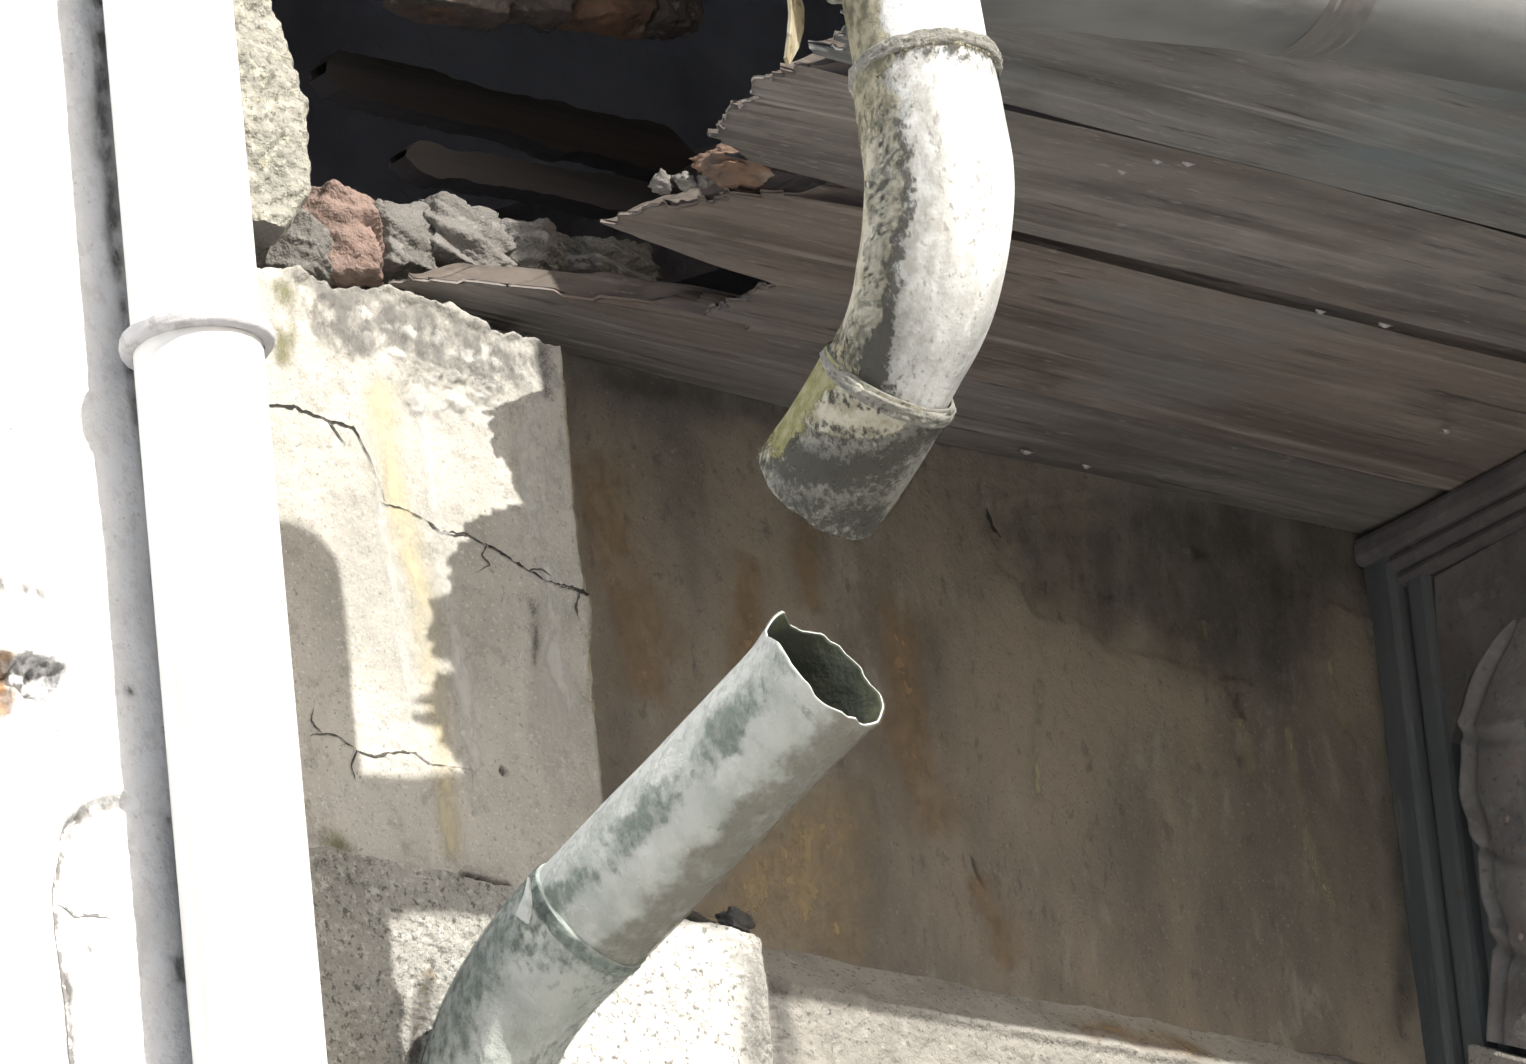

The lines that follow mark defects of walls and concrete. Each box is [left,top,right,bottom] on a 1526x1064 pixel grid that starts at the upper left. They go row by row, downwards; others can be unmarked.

peeling [313,281,534,386]
damp [372,385,425,601]
crack [269,404,590,620]
spalling [0,655,55,714]
crack [311,708,464,780]
damp [445,580,479,771]
crack [53,821,117,1064]